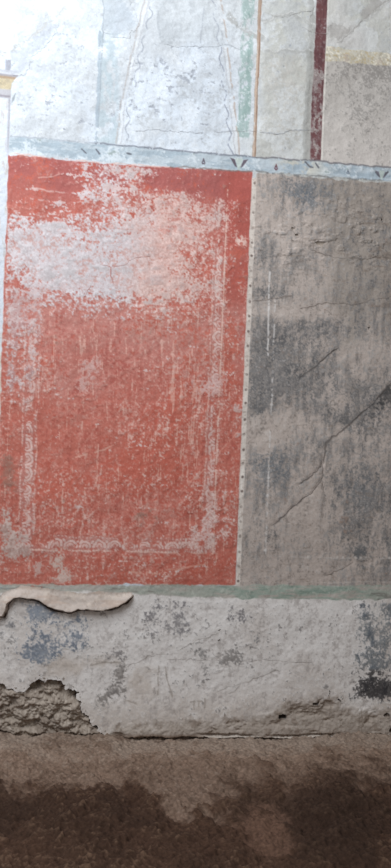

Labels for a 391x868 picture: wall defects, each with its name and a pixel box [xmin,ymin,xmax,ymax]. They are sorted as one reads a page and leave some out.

peeling [1,159,250,411]
crack [298,347,339,381]
crack [271,383,391,526]
peeling [181,481,238,554]
spalling [0,675,391,740]
leakage [347,601,391,708]